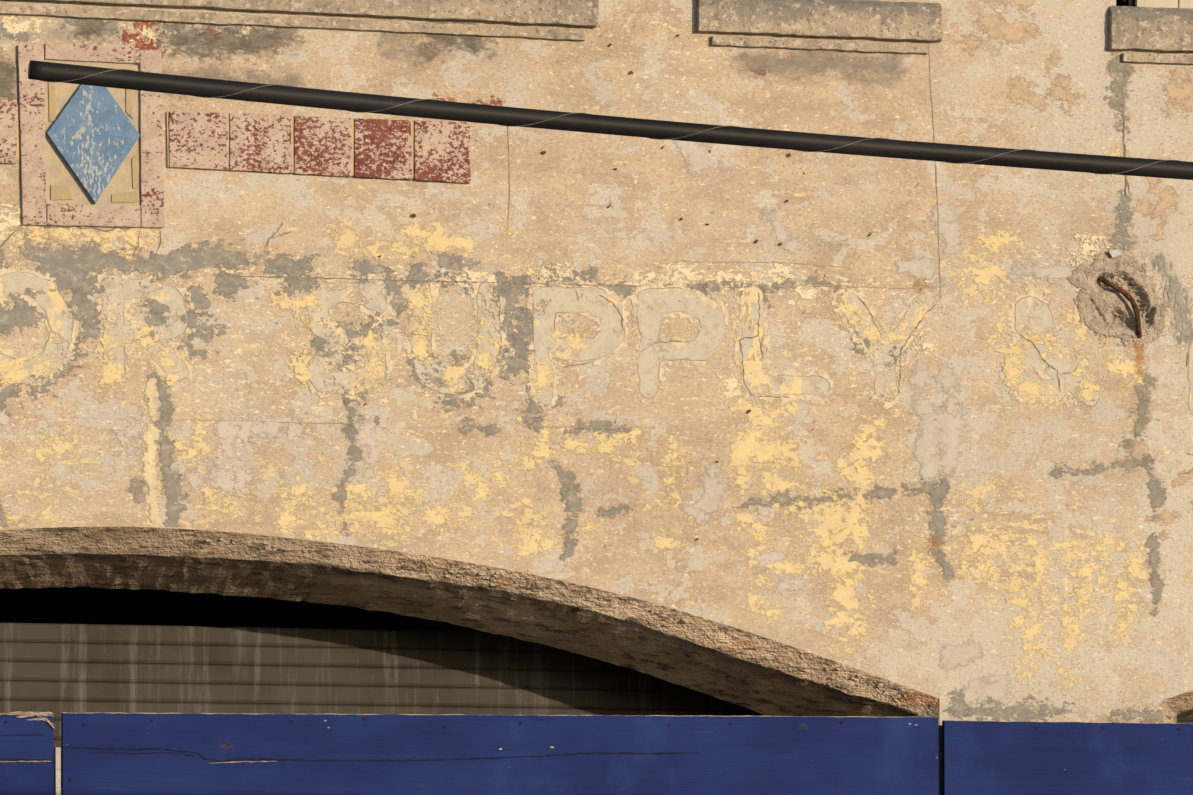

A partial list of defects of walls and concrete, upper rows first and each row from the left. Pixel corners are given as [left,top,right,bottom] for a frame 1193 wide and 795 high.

peeling [958,0,1042,56]
peeling [1006,45,1087,119]
damp [1104,48,1135,132]
peeling [1156,67,1193,119]
peeling [1106,174,1184,242]
peeling [715,200,849,309]
spalling [895,201,1174,410]
peeling [0,197,700,591]
damp [1123,372,1157,453]
peeling [647,298,1193,723]